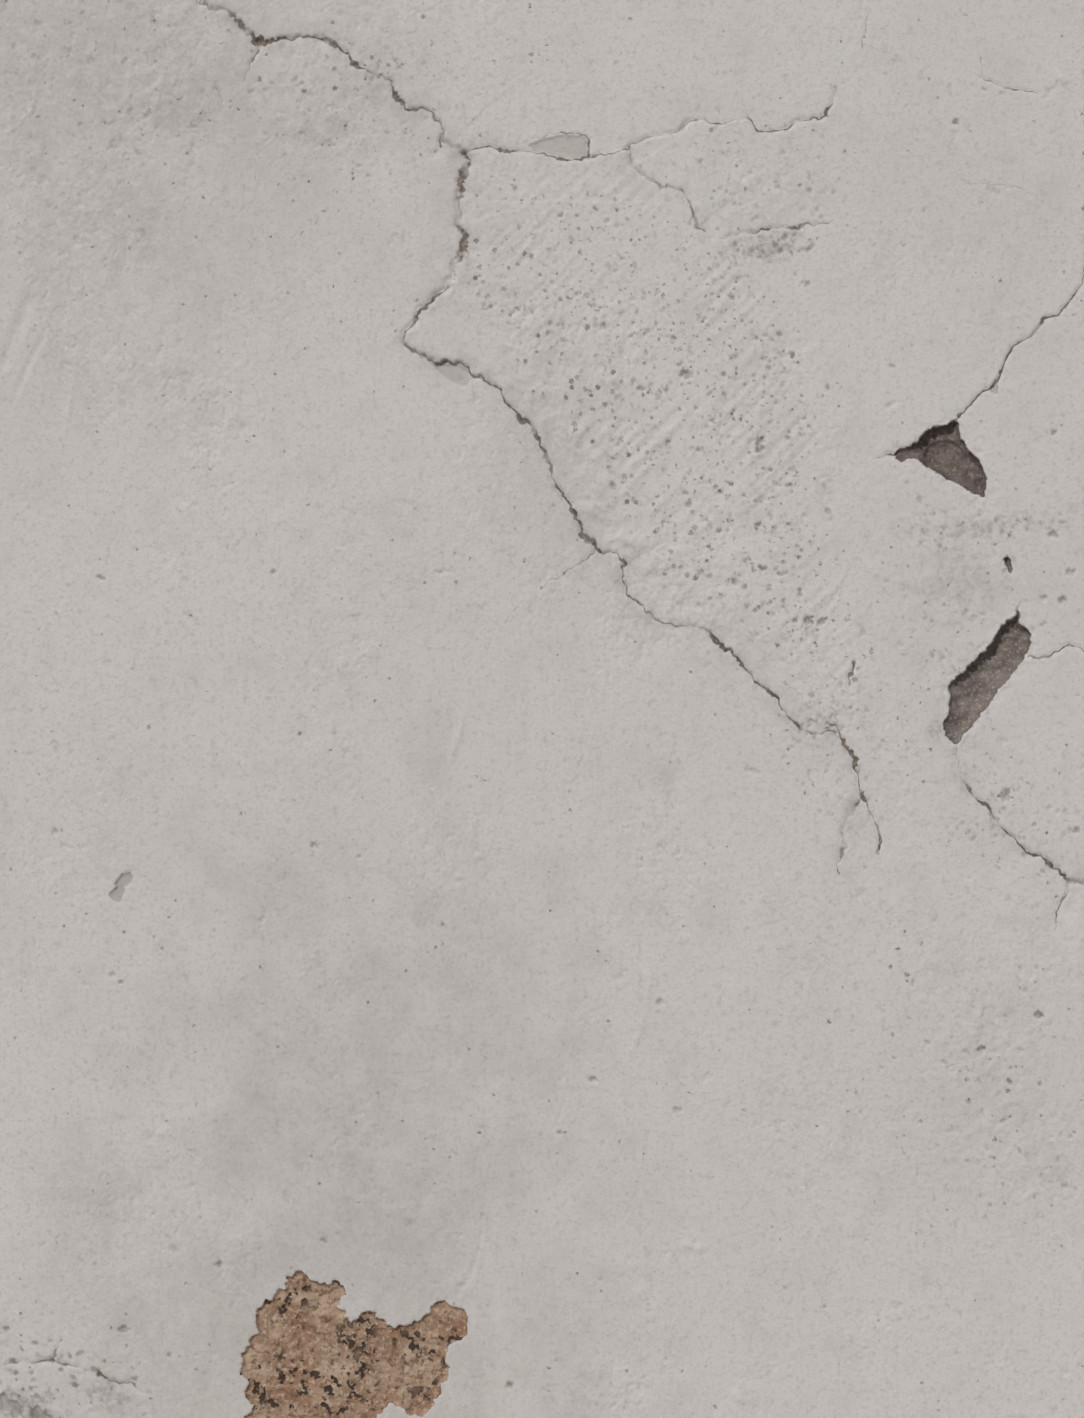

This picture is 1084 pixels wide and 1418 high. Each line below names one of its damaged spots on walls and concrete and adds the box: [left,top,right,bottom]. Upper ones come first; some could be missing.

crack [233,15,832,193]
crack [405,290,446,333]
crack [459,229,469,250]
crack [452,363,666,624]
peeling [403,106,862,734]
crack [756,223,820,233]
crack [957,275,1084,418]
crack [710,633,882,850]
crack [967,786,1067,917]
spalling [240,1271,468,1418]